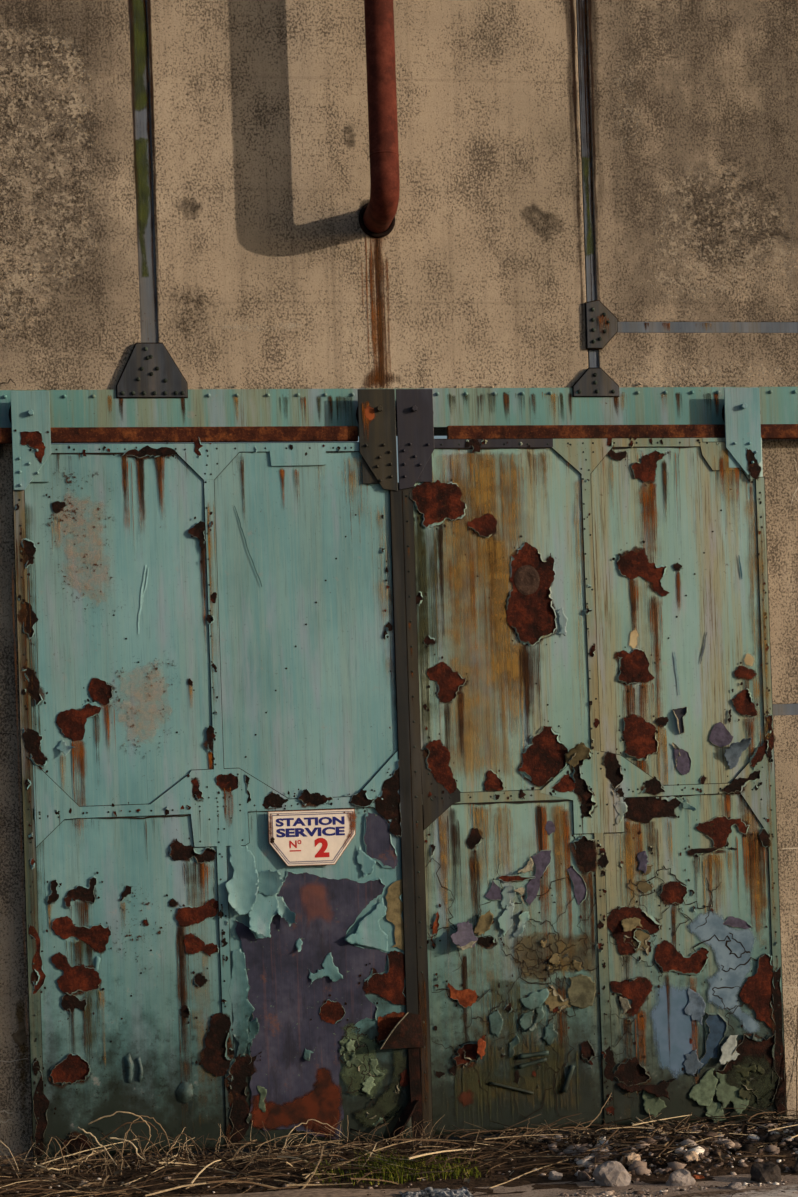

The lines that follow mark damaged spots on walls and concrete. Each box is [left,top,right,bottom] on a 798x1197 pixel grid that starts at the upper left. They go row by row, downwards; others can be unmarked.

corrosion [361,237,397,388]
corrosion [14,429,122,624]
corrosion [113,443,188,531]
corrosion [280,396,375,433]
corrosion [408,445,776,1126]
corrosion [28,725,334,1163]
peeling [218,812,404,1140]
peeling [451,821,556,951]
peeling [642,1090,667,1117]
peeling [682,1011,749,1123]
peeling [723,914,774,929]
corrosion [714,947,787,1115]